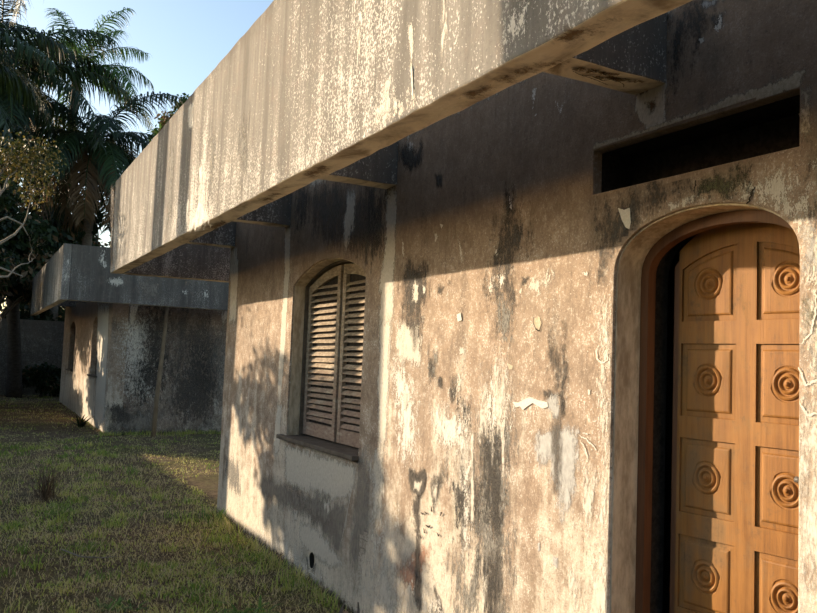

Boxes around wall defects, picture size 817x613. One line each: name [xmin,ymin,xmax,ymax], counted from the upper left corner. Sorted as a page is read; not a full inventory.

water stain [555,26,595,42]
water stain [591,0,812,156]
water stain [482,193,532,341]
peeling [584,154,817,295]
water stain [83,302,226,435]
water stain [259,166,519,613]
peeling [513,395,579,521]
water stain [543,327,568,417]
water stain [583,297,611,613]
water stain [215,507,353,613]